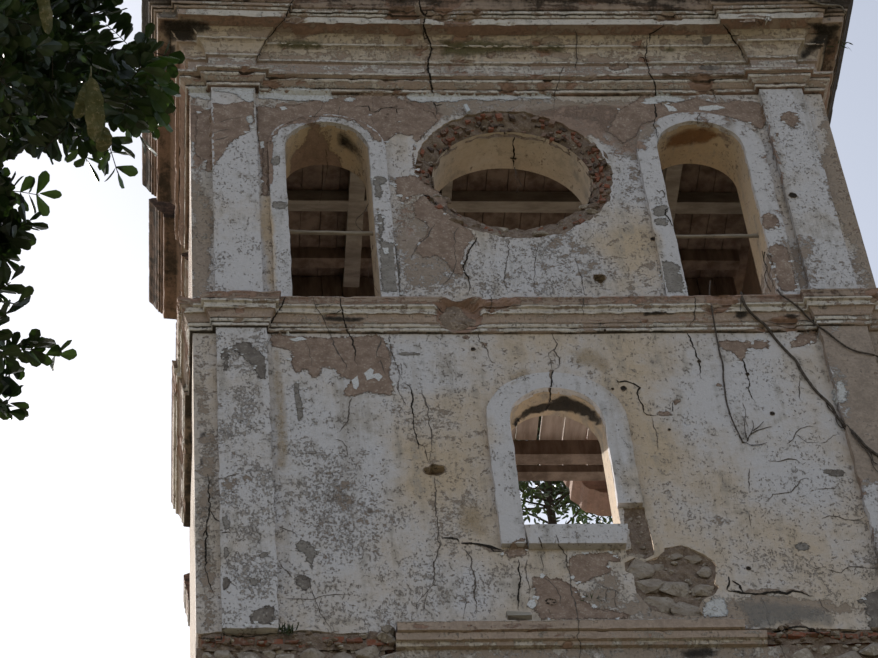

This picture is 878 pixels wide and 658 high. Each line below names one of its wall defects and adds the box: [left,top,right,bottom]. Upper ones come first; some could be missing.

crack [415,0,442,114]
spalling [190,90,615,275]
crack [441,227,477,293]
flaking render [219,341,267,381]
flaking render [269,331,423,421]
crack [617,380,673,447]
crack [687,297,701,373]
crack [307,298,581,658]
crack [203,474,235,596]
spalling [527,508,718,620]
crack [726,576,860,658]
flaking render [857,589,878,627]